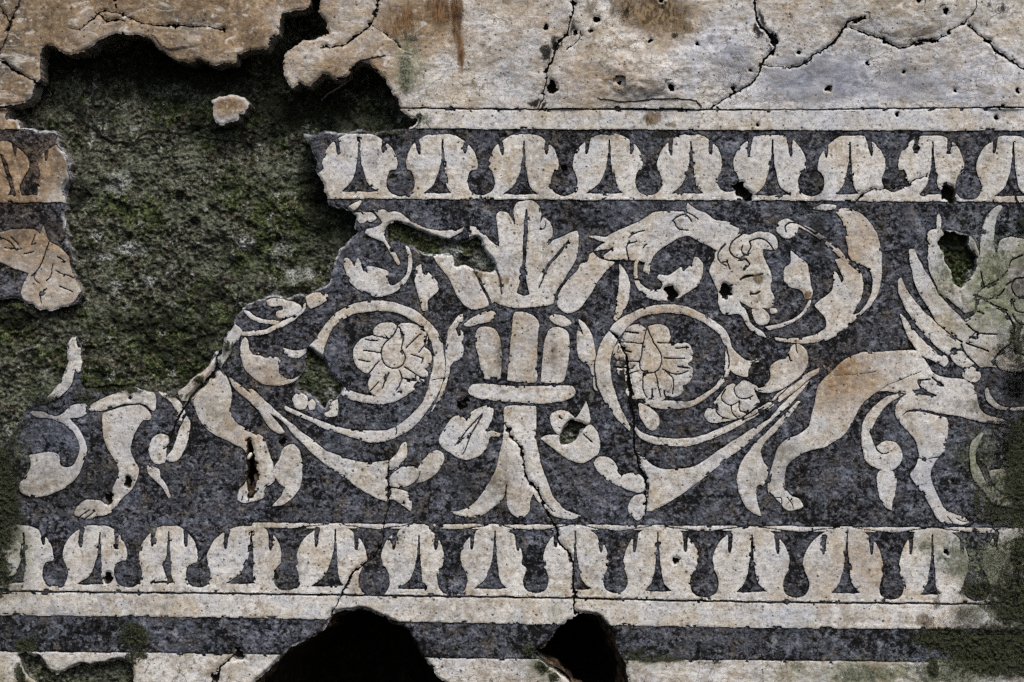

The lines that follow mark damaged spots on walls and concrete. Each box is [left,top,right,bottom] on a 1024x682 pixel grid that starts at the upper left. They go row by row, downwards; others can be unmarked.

crack [538,0,581,109]
crack [597,0,1024,109]
peeling [0,0,417,445]
peeling [937,232,976,287]
crack [611,331,648,521]
crack [332,461,405,614]
crack [505,424,577,611]